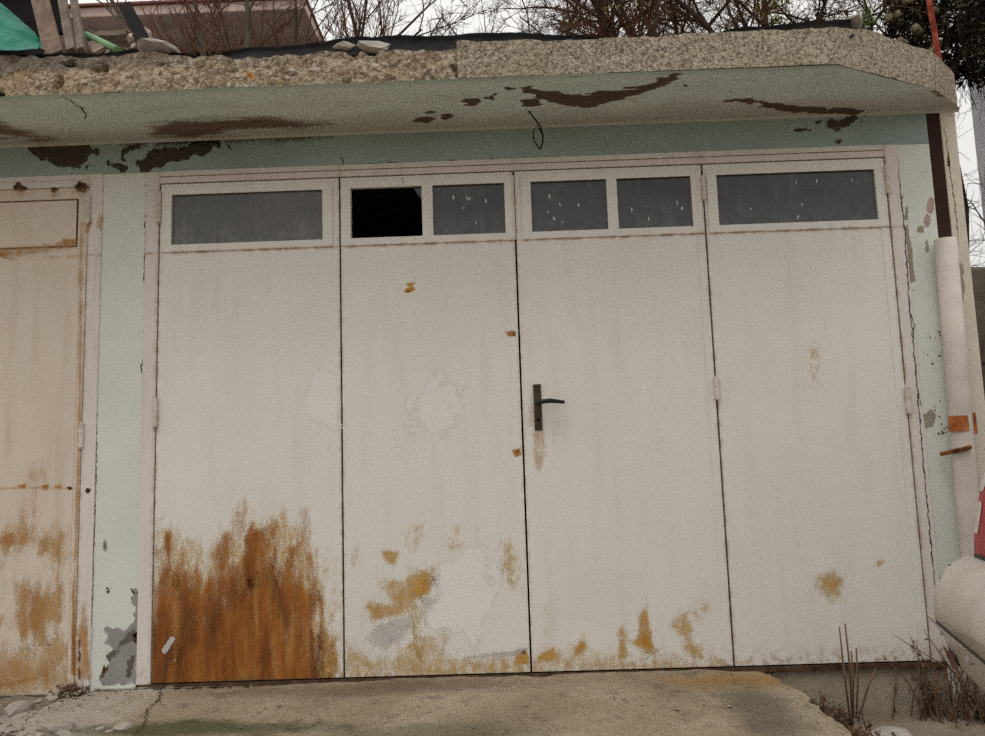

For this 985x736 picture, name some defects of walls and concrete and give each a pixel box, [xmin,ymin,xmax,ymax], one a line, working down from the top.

flaking render [461,73,688,108]
damp [0,122,62,145]
flaking render [27,136,327,174]
flaking render [412,111,454,123]
flaking render [724,98,866,144]
rust [0,216,103,434]
rust [0,449,91,694]
rust [152,504,731,683]
rust [817,573,843,597]
flaking render [99,588,138,686]
peeling [365,615,413,652]
crack [136,688,165,732]